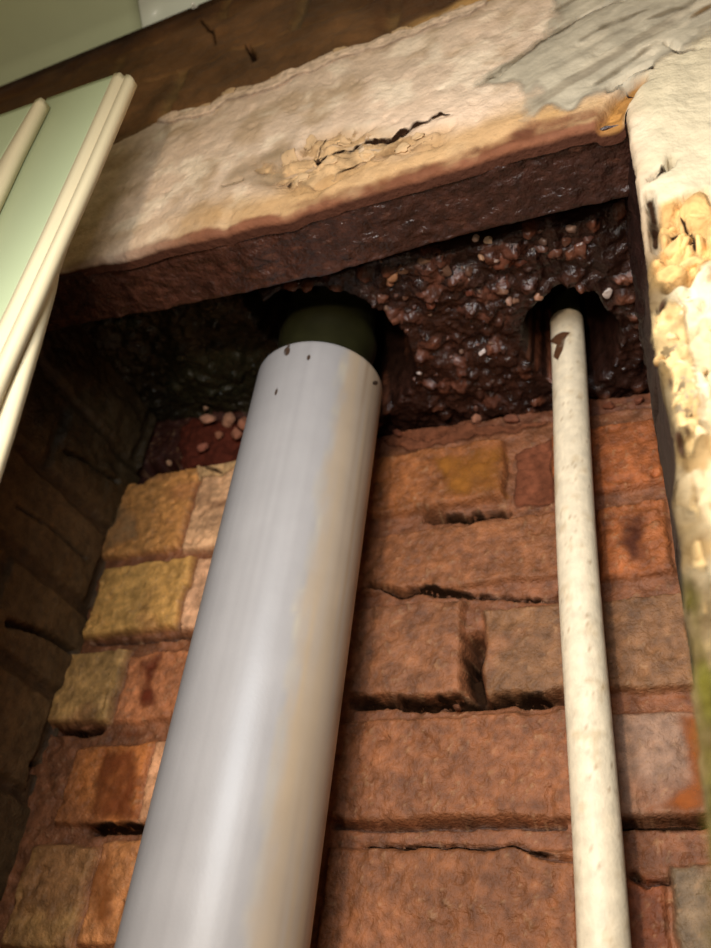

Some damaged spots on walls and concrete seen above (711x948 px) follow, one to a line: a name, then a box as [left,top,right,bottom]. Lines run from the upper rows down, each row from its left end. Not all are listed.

crack [314,112,450,165]
spalling [653,297,708,455]
spalling [692,541,706,569]